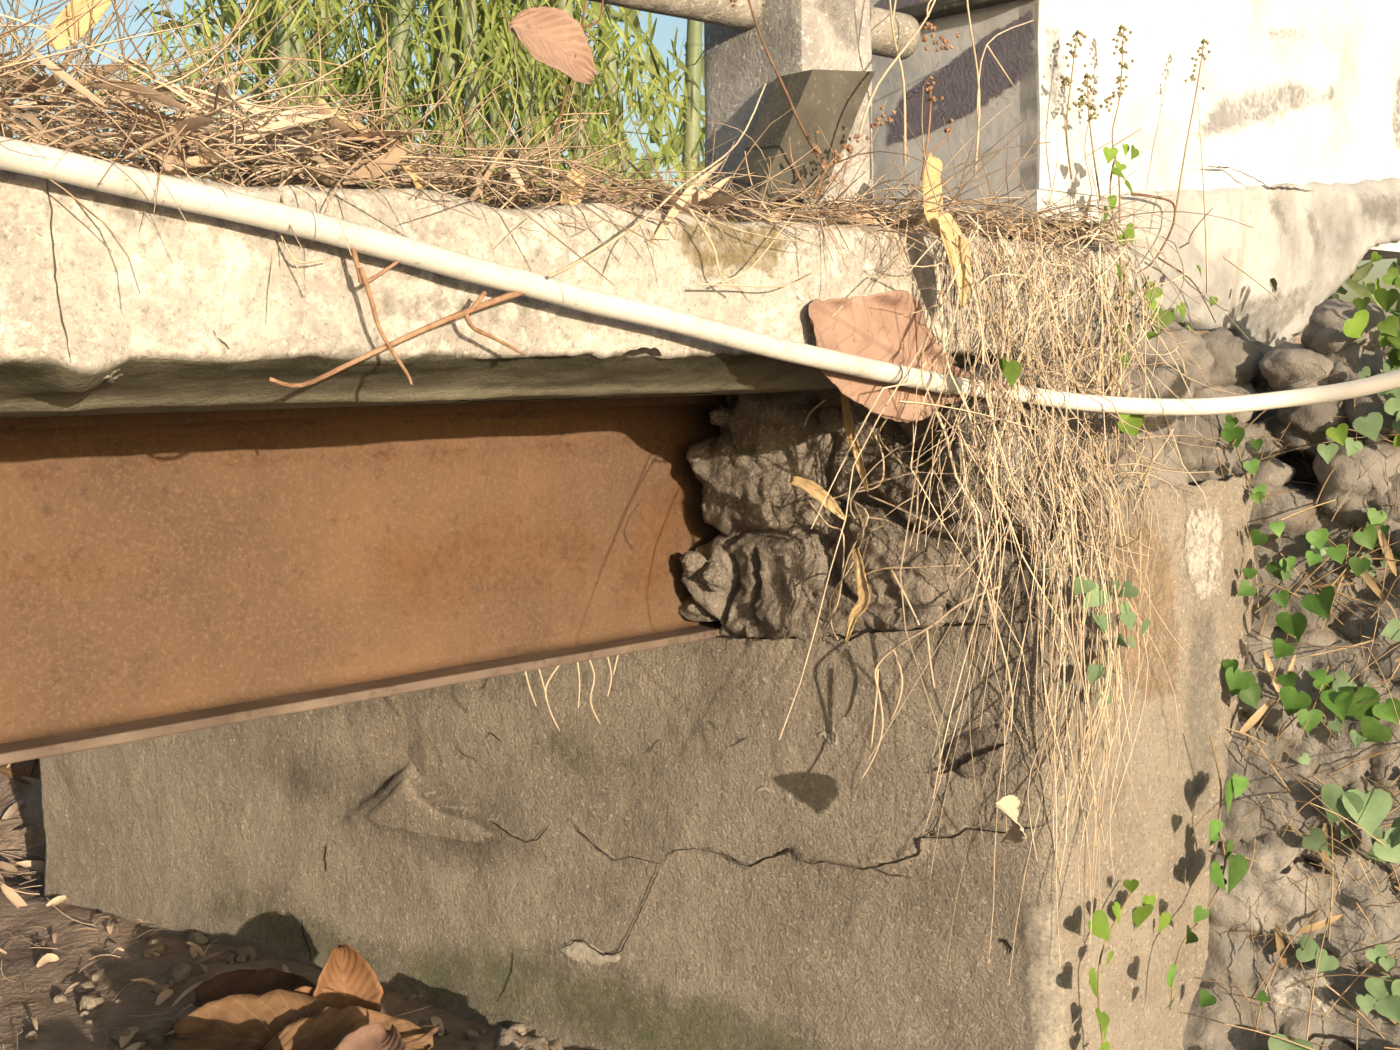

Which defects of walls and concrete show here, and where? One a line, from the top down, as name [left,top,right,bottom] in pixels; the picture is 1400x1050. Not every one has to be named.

crack [46,179,71,362]
crack [939,743,1008,774]
crack [493,816,1059,954]